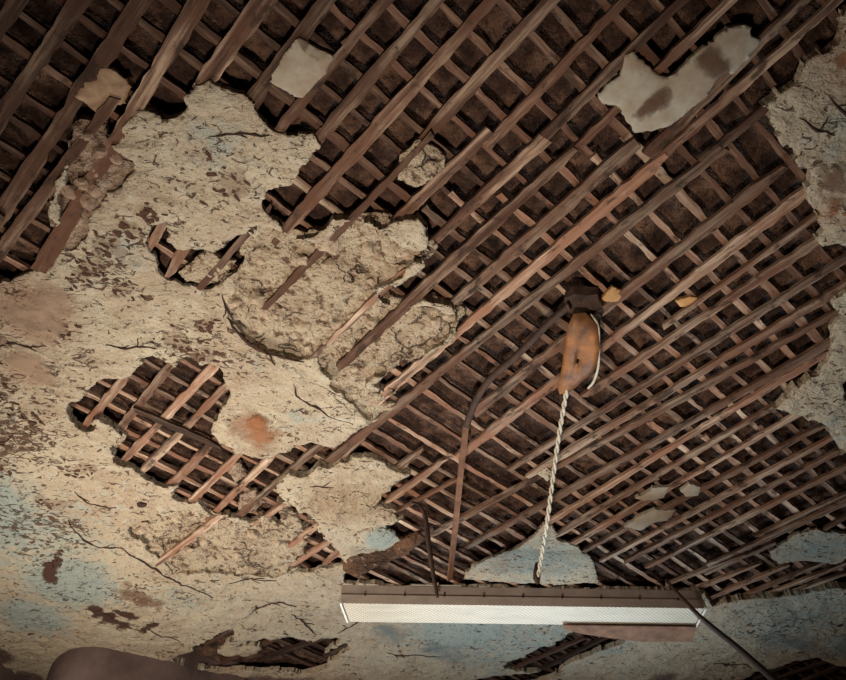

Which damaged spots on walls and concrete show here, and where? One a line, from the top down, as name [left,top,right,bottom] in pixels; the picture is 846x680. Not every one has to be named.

crack [799,98,846,136]
spalling [49,115,168,301]
peeling [206,167,251,202]
spalling [148,208,467,426]
peeling [0,383,45,434]
crack [68,520,213,598]
spalling [130,496,318,577]